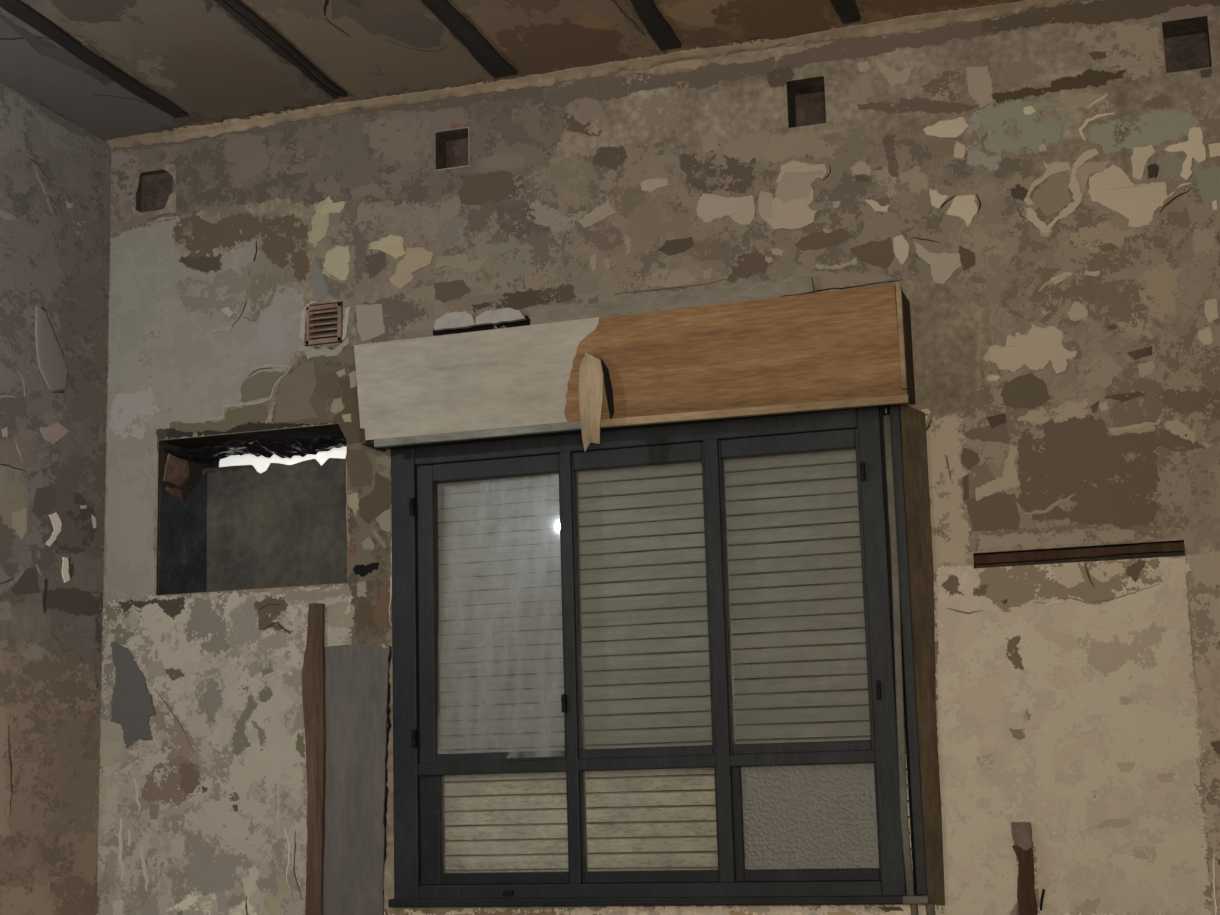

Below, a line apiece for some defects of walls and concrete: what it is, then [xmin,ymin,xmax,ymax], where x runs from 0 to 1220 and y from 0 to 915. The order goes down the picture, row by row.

crack [324,0,350,37]
peeling [966,65,995,108]
peeling [923,117,969,158]
peeling [1024,127,1220,237]
peeling [307,183,387,281]
peeling [368,235,489,303]
peeling [645,237,713,288]
peeling [696,159,978,285]
spalling [170,301,392,551]
peeling [961,311,1077,531]
spalling [31,486,62,547]
peeling [62,557,70,583]